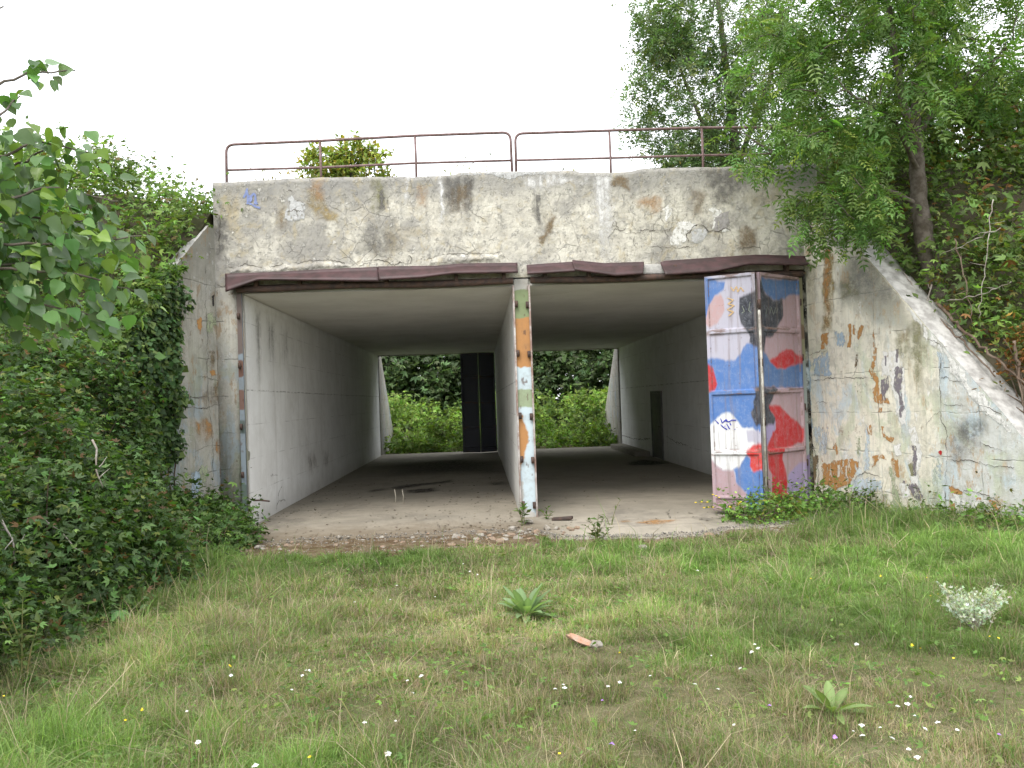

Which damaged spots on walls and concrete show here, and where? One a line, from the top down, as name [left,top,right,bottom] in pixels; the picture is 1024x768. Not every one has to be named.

leakage [439,176,473,212]
crack [592,211,762,252]
rust [822,249,834,328]
peeling [809,324,998,516]
crack [925,339,1014,503]